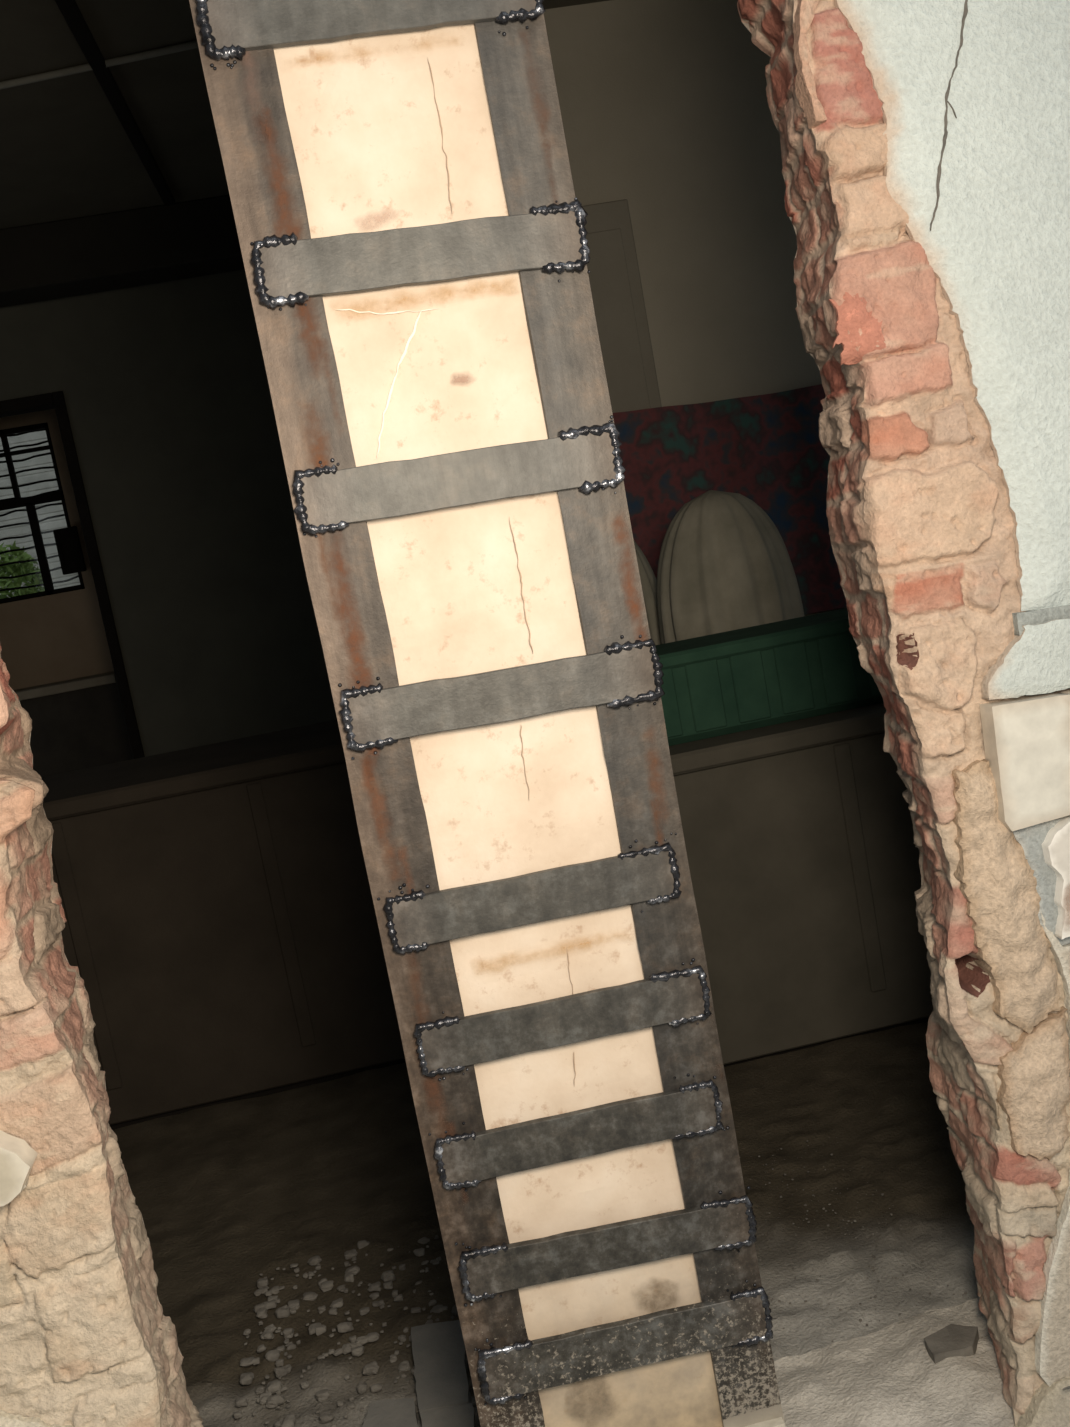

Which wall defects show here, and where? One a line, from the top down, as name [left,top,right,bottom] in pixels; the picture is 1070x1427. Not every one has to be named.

crack [930,0,968,231]
spalling [0,686,9,728]
spalling [793,0,1070,1427]
spalling [0,781,160,1427]